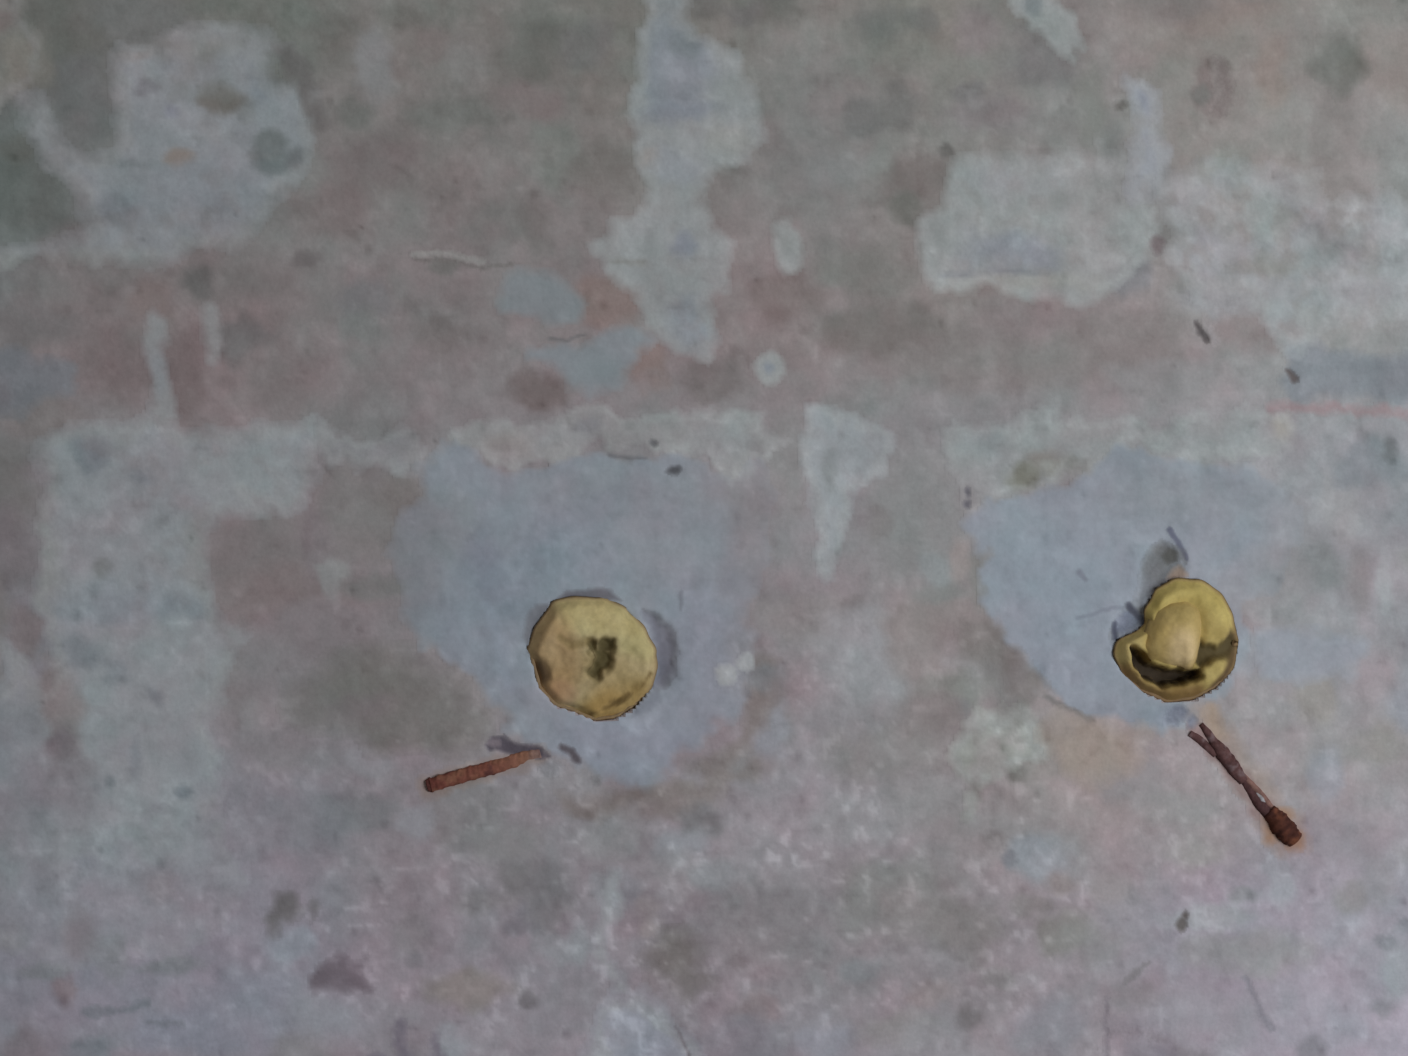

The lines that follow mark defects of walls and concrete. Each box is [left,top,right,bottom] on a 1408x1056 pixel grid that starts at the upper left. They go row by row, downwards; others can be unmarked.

rust [414,742,551,802]
rust [1182,697,1314,862]